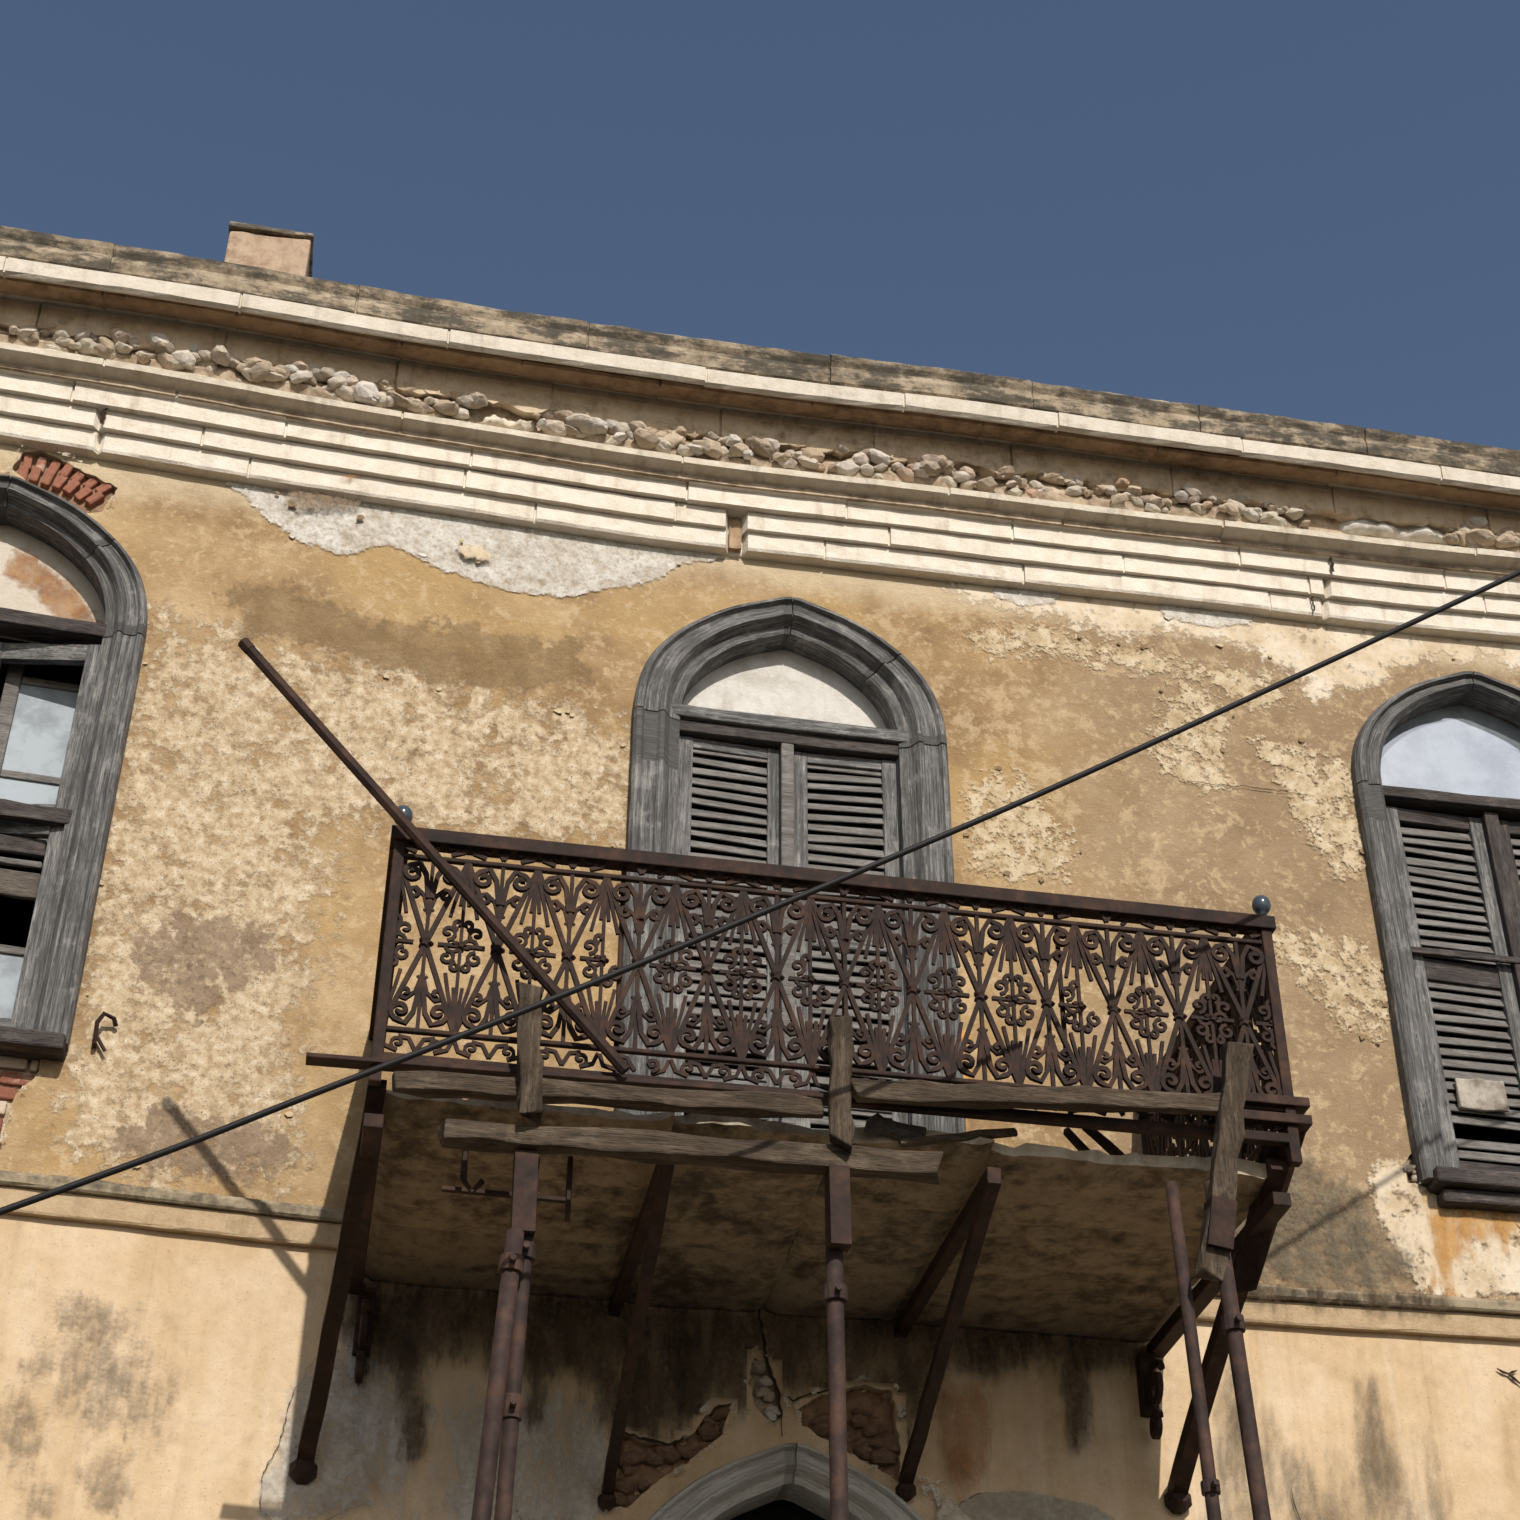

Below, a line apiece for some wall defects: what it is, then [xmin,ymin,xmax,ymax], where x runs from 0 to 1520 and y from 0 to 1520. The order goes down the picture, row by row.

flaking render [6,443,115,513]
flaking render [226,481,728,598]
flaking render [941,582,1520,885]
flaking render [0,598,631,1202]
flaking render [1272,924,1391,1045]
leakage [1251,1158,1448,1310]
flaking render [1368,1156,1520,1298]
flaking render [614,1347,907,1510]
flaking render [918,1475,971,1520]
leakage [1062,1362,1092,1448]